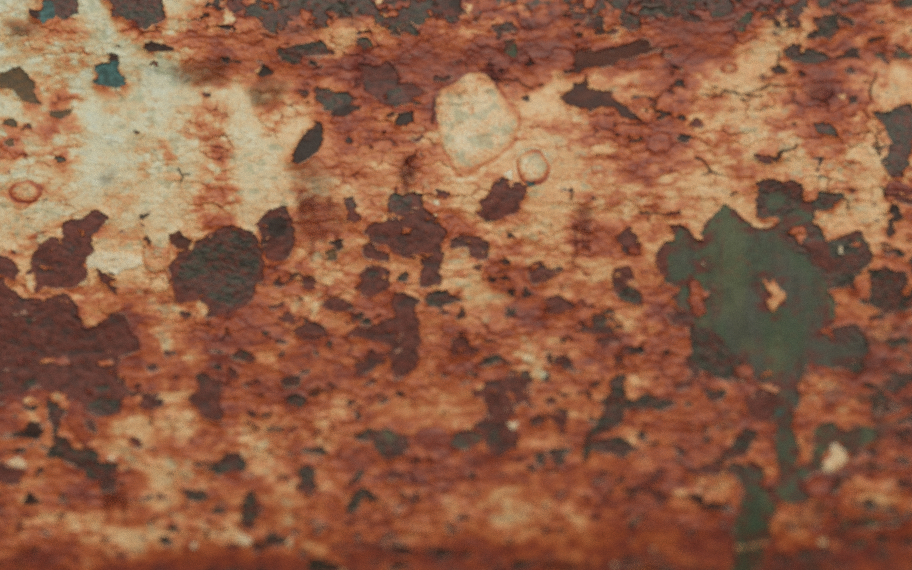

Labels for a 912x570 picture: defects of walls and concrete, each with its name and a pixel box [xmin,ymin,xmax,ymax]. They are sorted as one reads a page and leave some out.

peeling [101,0,180,68]
peeling [188,0,481,170]
crack [631,90,675,116]
crack [695,157,723,177]
peeling [555,0,912,148]
crack [701,53,835,107]
crack [776,144,799,156]
crack [869,71,878,102]
peeling [0,184,490,511]
peeling [446,97,912,570]
peeling [131,447,350,570]
peeling [341,400,435,540]